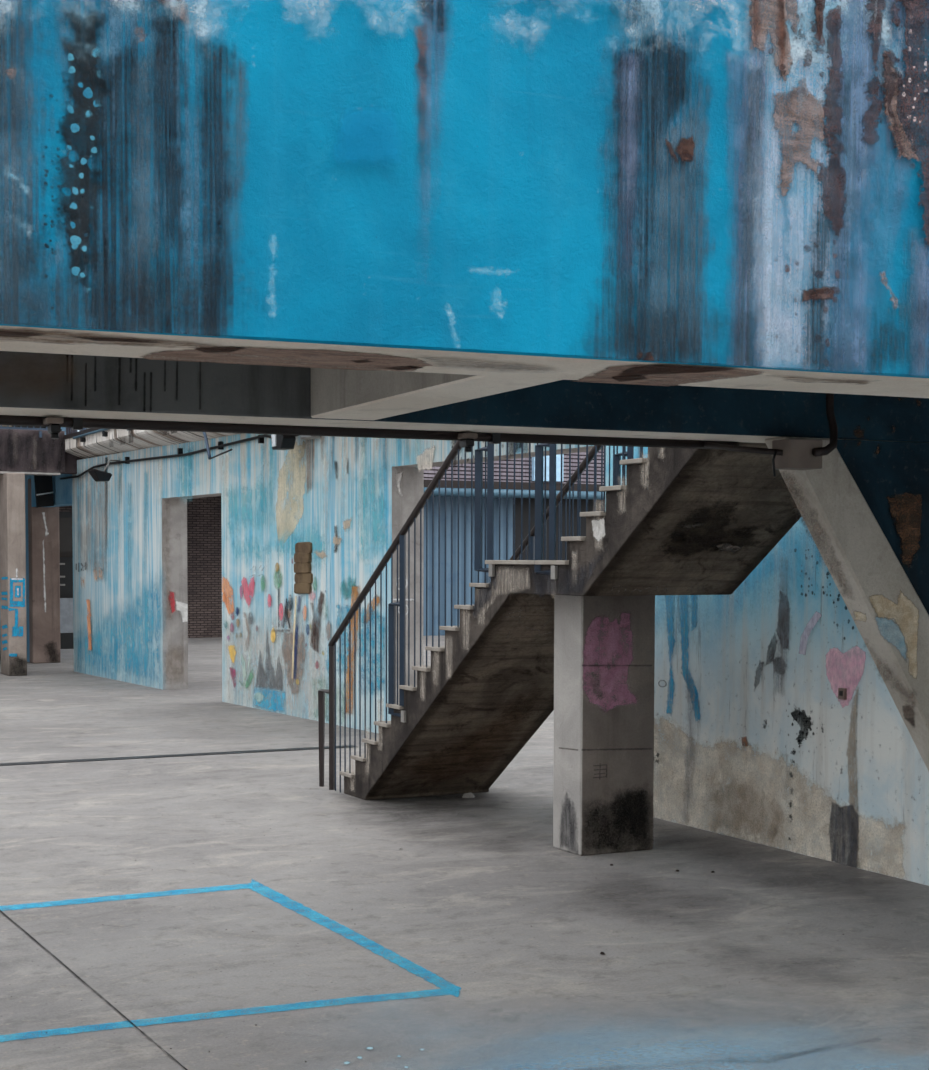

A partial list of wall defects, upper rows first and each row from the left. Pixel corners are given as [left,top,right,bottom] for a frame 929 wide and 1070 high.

peeling [196,0,211,36]
peeling [631,0,660,32]
peeling [861,0,929,247]
damp [0,0,244,336]
damp [596,35,709,362]
peeling [749,0,847,367]
peeling [881,272,898,308]
damp [662,504,759,556]
damp [560,790,650,853]